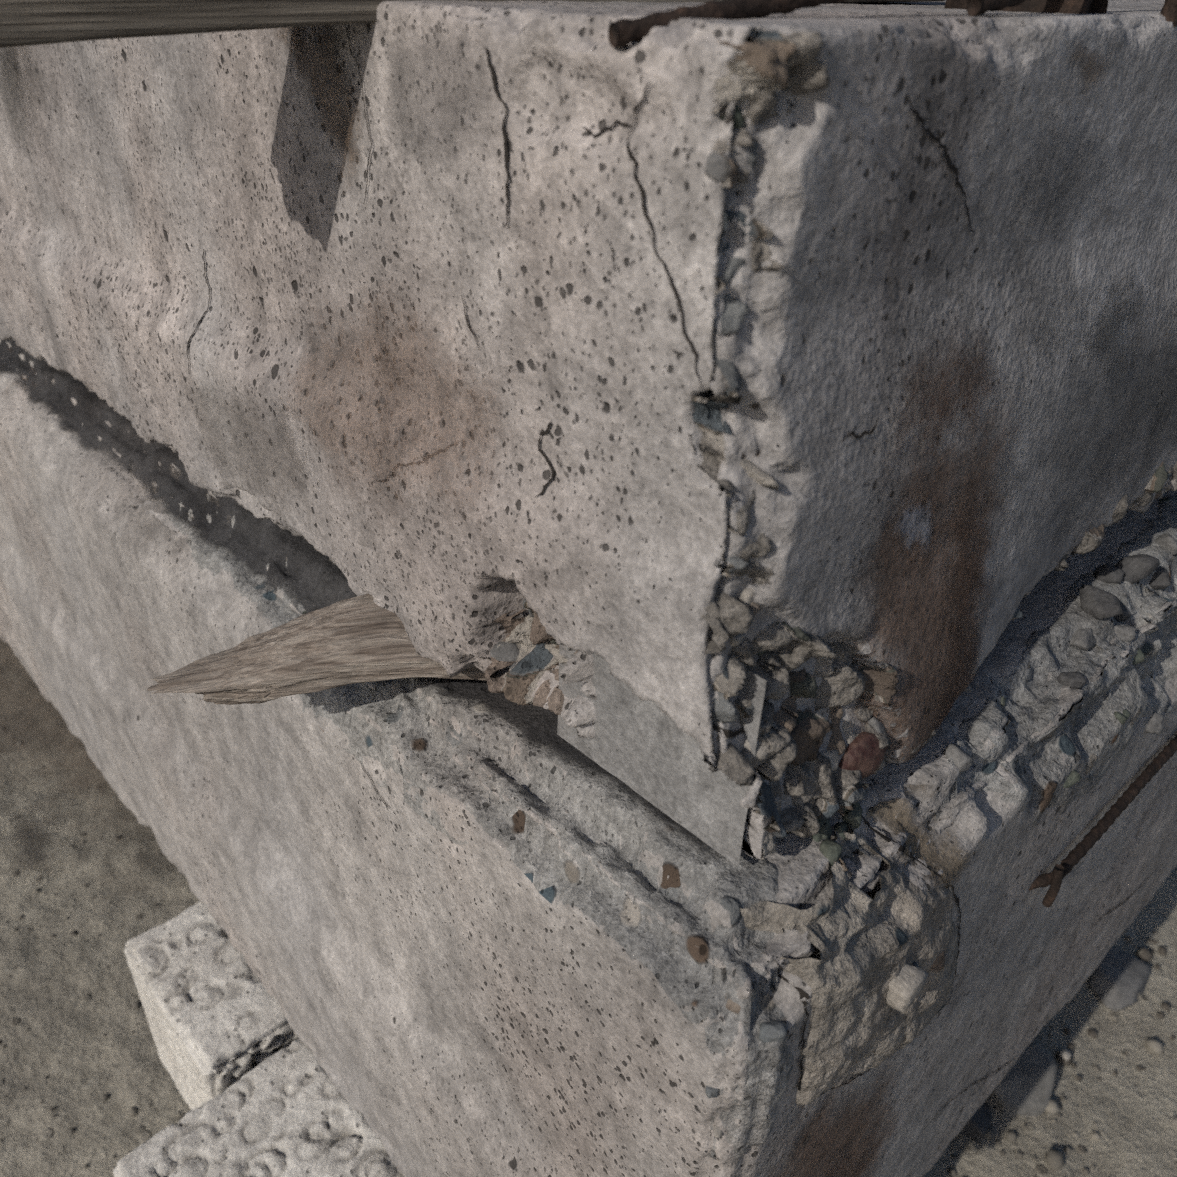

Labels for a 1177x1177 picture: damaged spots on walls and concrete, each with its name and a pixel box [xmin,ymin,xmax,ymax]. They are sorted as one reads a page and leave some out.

crack [187,249,210,370]
crack [485,47,510,229]
crack [583,82,701,386]
spalling [713,209,785,334]
spalling [704,31,830,187]
crack [908,99,975,233]
spalling [163,493,312,629]
spalling [299,356,899,1164]